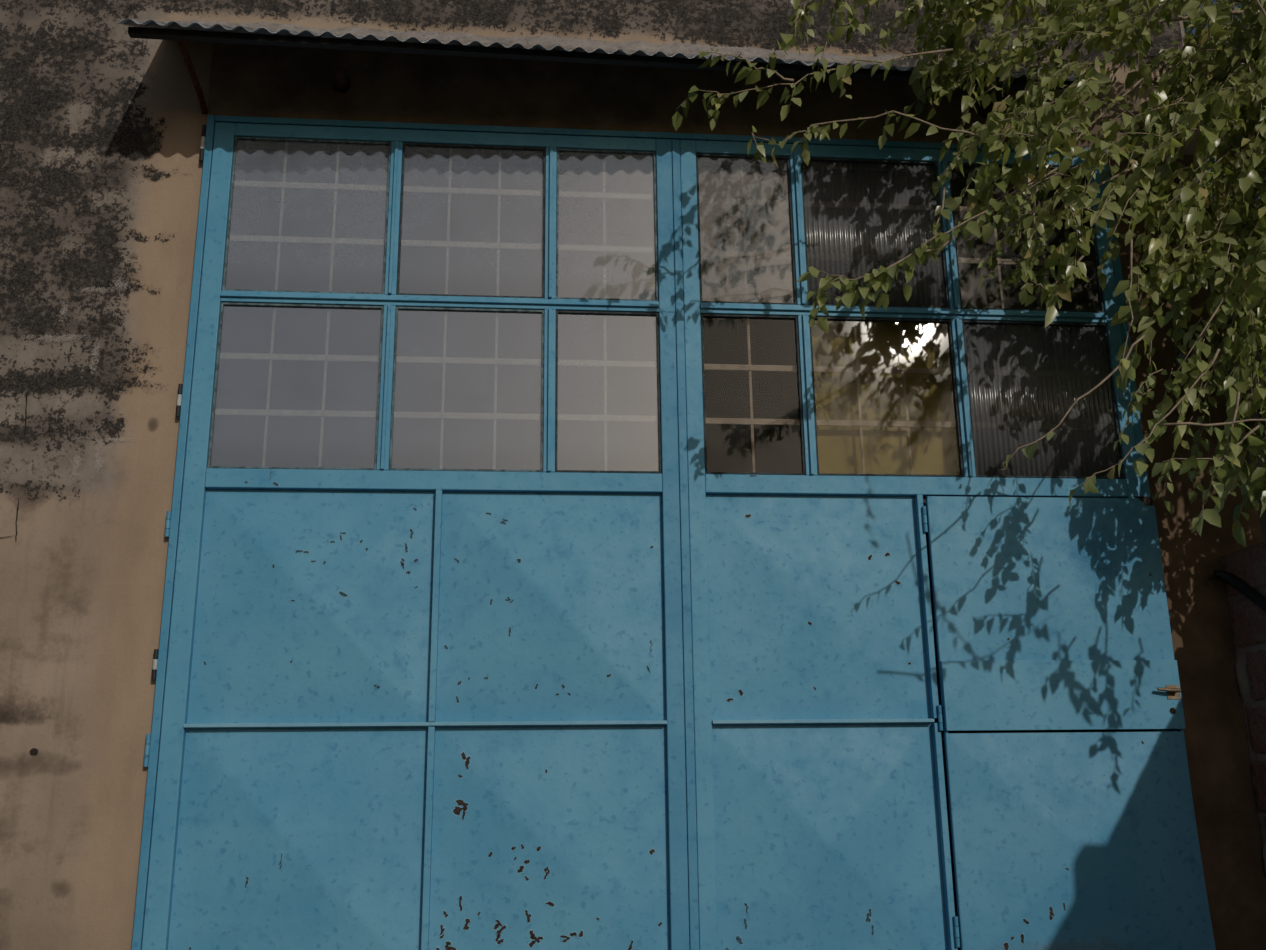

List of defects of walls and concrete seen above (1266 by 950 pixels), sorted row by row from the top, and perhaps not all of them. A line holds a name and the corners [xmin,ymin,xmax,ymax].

leakage [0,0,1183,457]
leakage [0,477,81,500]
leakage [0,709,40,723]